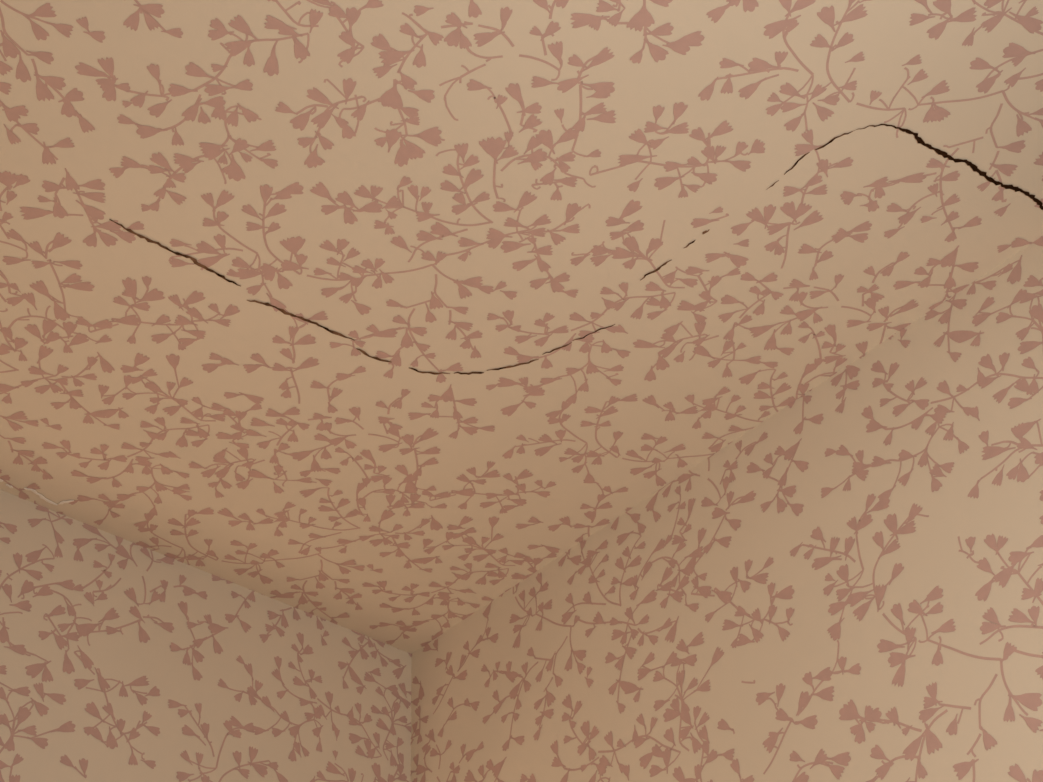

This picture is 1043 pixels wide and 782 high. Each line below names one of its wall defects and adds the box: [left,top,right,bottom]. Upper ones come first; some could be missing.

crack [766,124,1043,210]
crack [109,219,615,375]
crack [640,230,709,281]